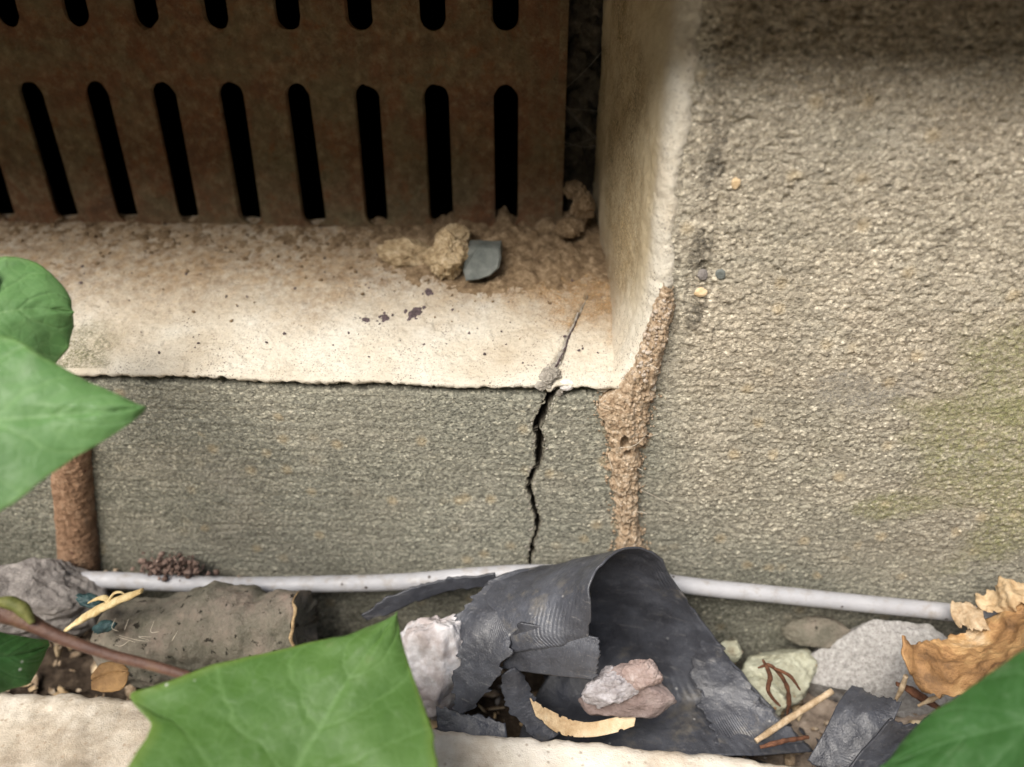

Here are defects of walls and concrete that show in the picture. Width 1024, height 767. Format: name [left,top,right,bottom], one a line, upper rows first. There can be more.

crack [519,294,588,564]